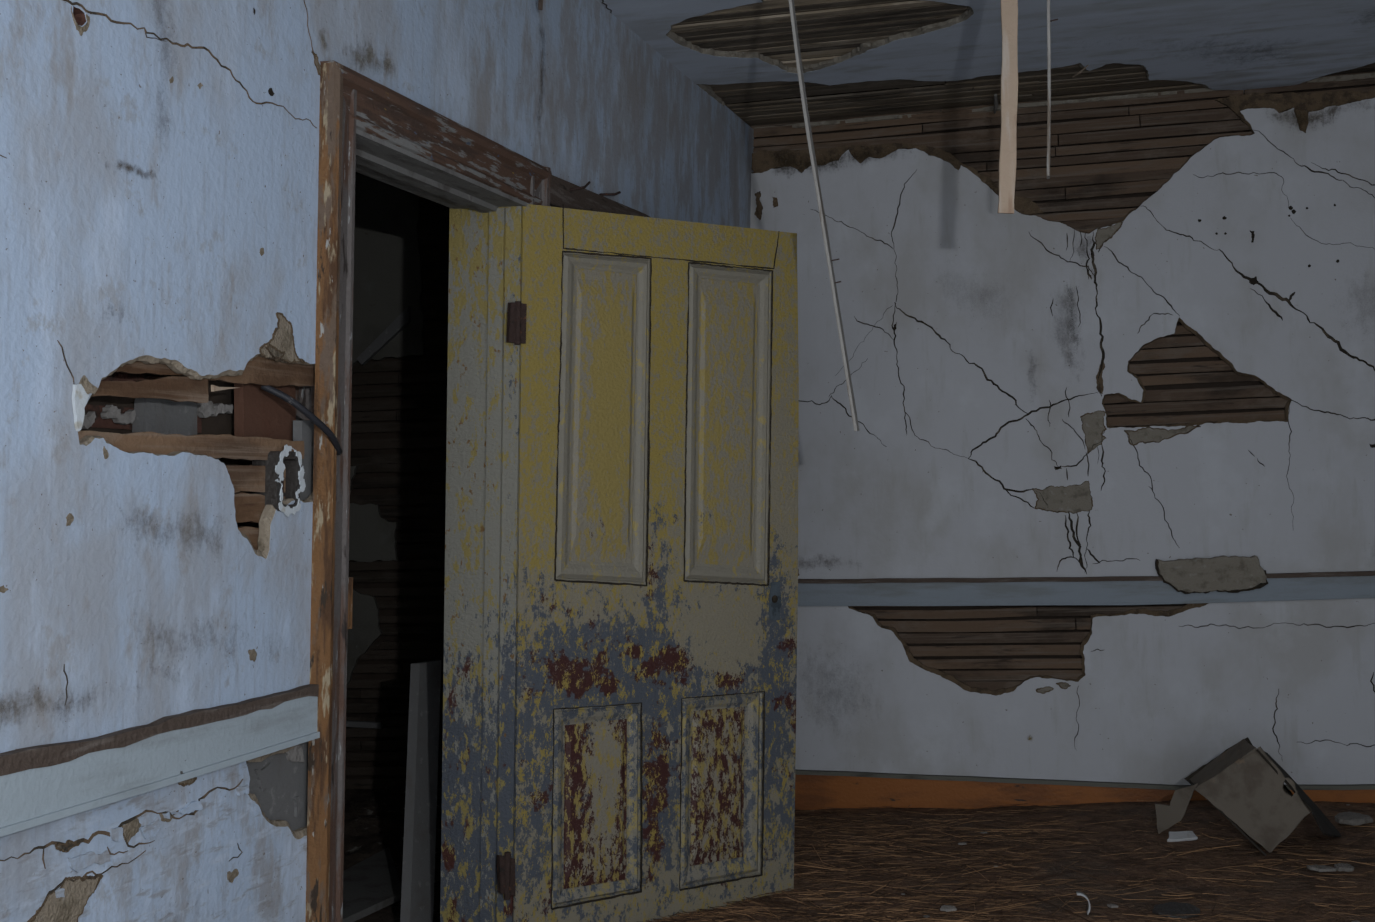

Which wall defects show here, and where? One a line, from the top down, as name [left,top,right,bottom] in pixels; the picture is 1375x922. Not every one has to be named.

crack [63,0,317,128]
flaking render [666,0,1375,250]
crack [1193,130,1375,248]
flaking render [72,312,315,559]
crack [799,169,1375,574]
flaking render [1080,317,1292,453]
flaking render [848,559,1269,696]
flaking render [31,777,203,922]
crack [0,779,243,922]
flaking render [236,741,309,839]